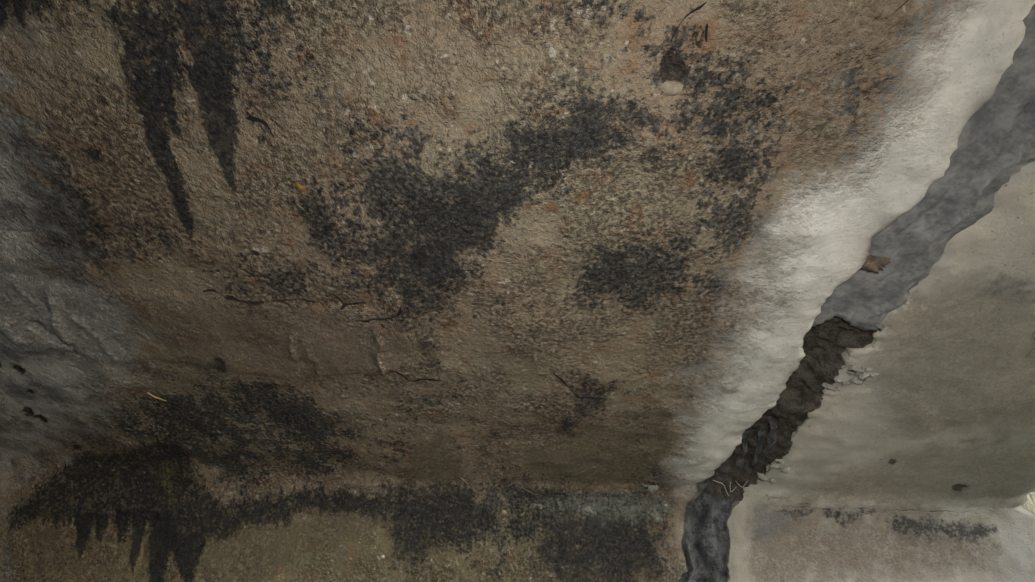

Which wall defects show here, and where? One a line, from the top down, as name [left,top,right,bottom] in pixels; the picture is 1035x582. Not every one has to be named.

water stain [0,0,55,29]
crack [670,2,708,44]
water stain [104,0,246,241]
water stain [686,55,766,190]
water stain [373,99,672,314]
water stain [557,377,626,437]
water stain [6,438,506,582]
water stain [525,483,674,582]
crack [768,504,968,513]